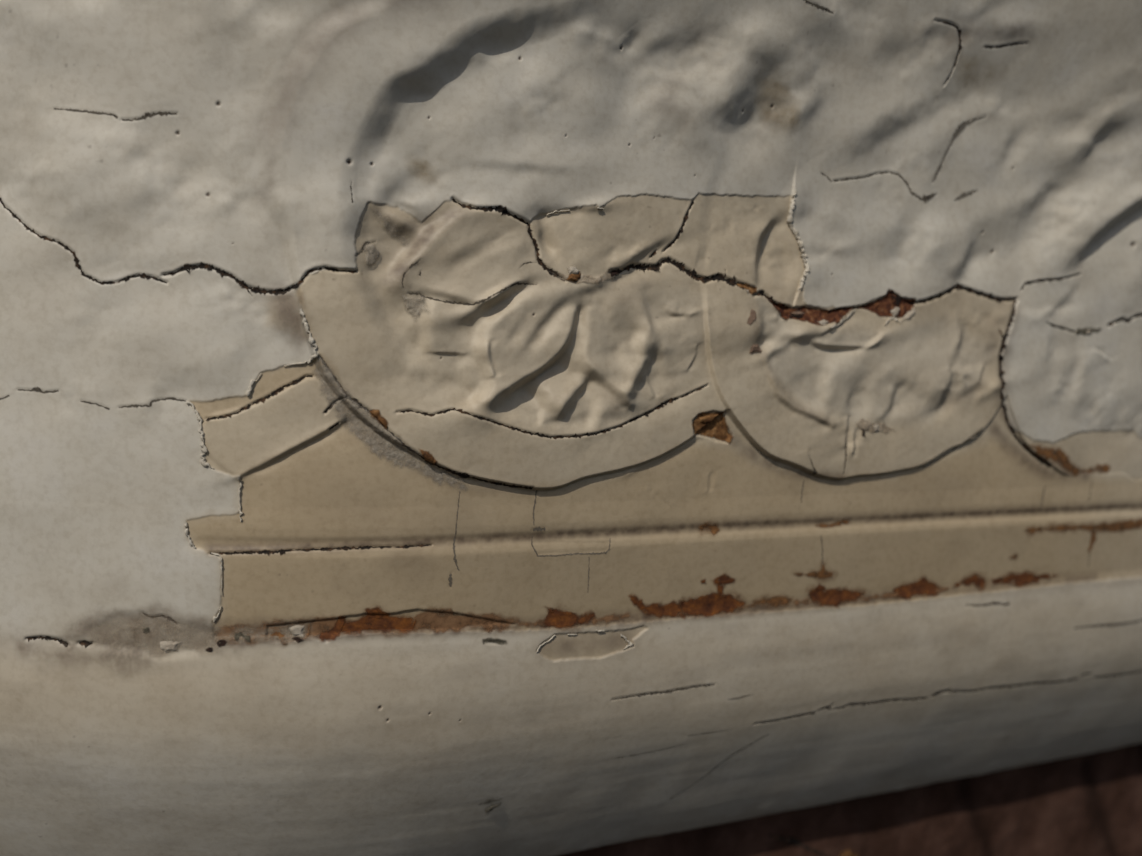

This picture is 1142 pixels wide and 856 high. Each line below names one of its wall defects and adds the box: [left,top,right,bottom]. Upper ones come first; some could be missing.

crack [0,198,372,295]
crack [402,198,565,305]
crack [620,202,788,309]
peeling [542,191,916,349]
crack [0,387,186,410]
peeling [93,296,466,655]
crack [206,356,707,593]
flaking render [693,412,733,443]
flaking render [857,419,895,436]
rust [1035,446,1111,475]
peeling [537,626,647,661]
rust [215,565,1056,644]